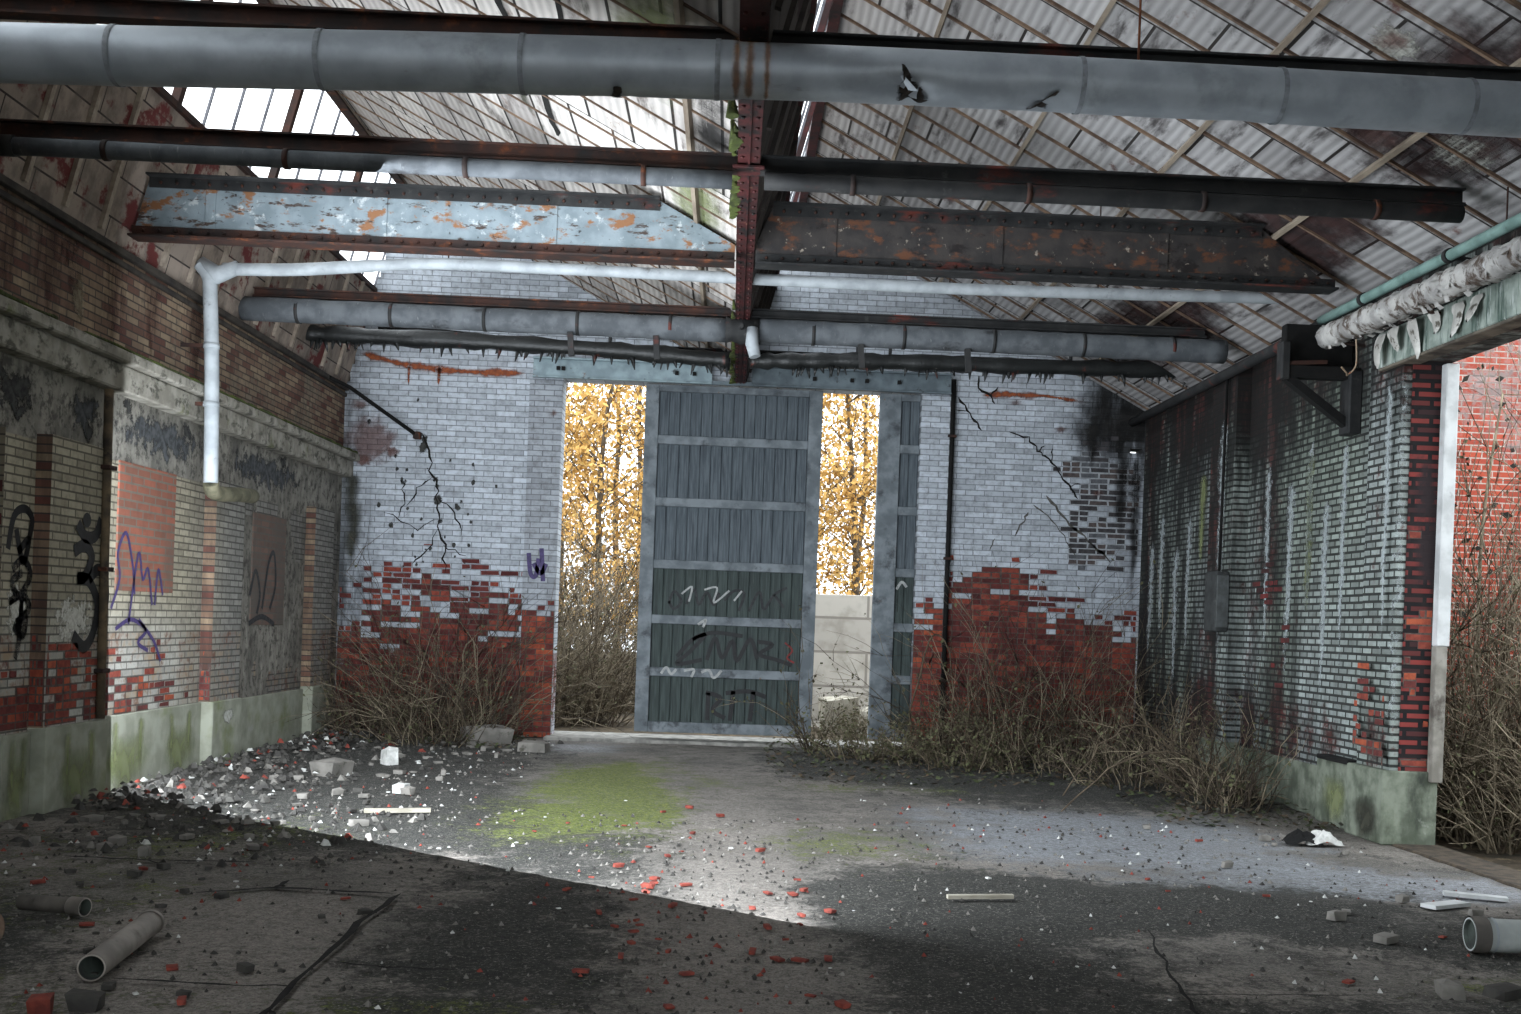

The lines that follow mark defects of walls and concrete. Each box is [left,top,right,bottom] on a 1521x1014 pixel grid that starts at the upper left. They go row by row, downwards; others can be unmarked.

crack [384,433,466,571]
peeling [0,583,211,732]
peeling [334,434,555,737]
peeling [910,436,1141,756]
crack [70,856,454,1014]
crack [1148,930,1342,1014]